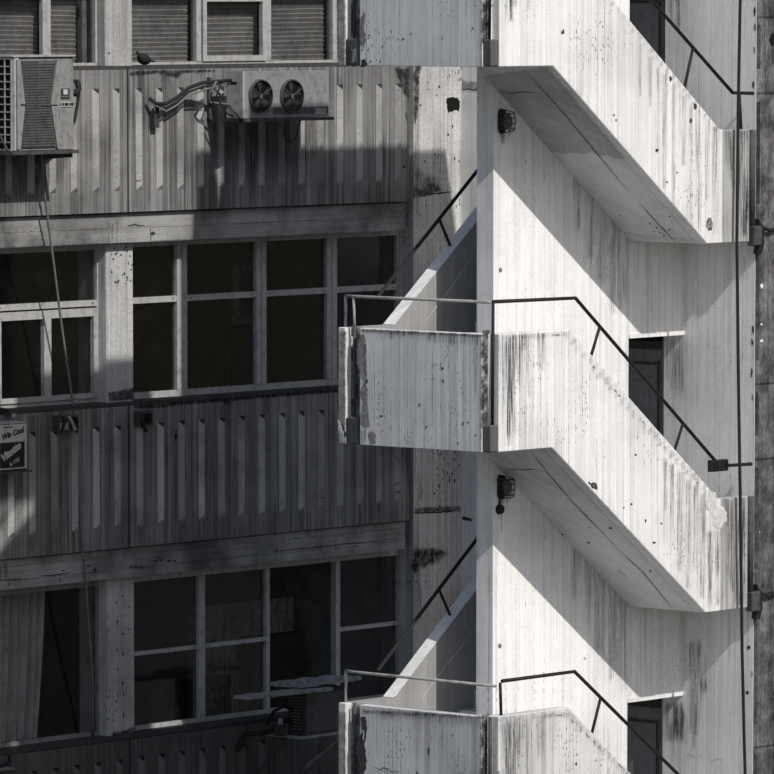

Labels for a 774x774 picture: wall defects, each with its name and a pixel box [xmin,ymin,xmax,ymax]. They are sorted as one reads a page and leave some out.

peeling [346,10,381,67]
water stain [396,66,421,145]
spalling [427,85,460,113]
peeling [350,334,376,444]
peeling [355,717,367,774]